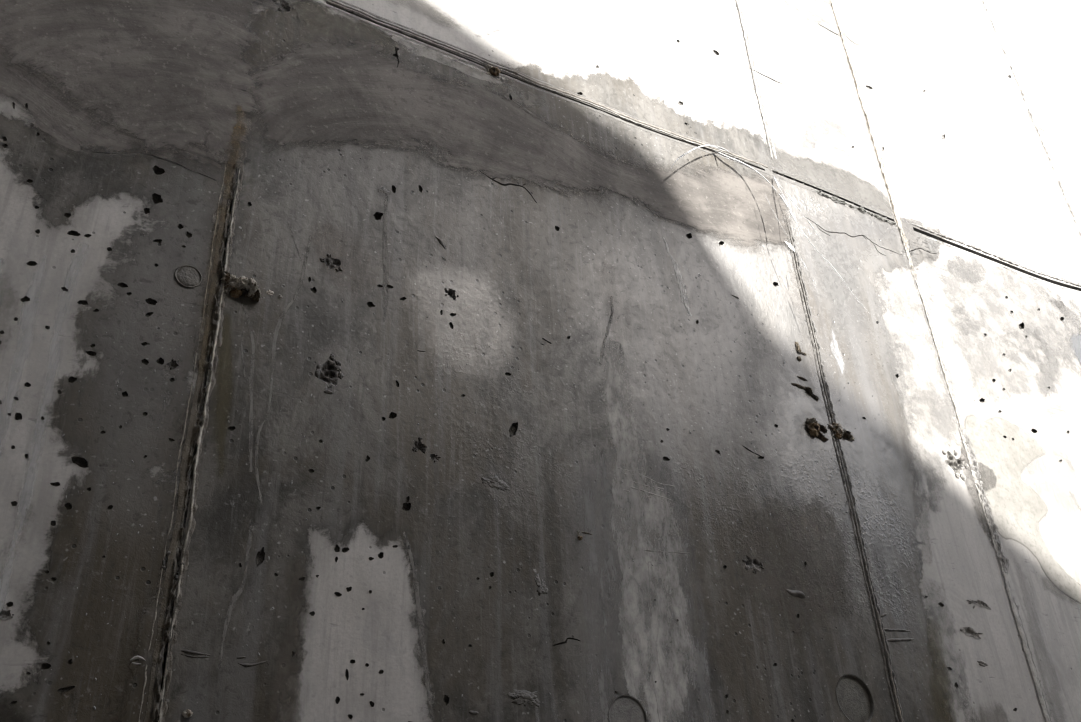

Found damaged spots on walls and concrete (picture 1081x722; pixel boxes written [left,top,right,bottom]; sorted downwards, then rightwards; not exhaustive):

crack [807,218,937,255]